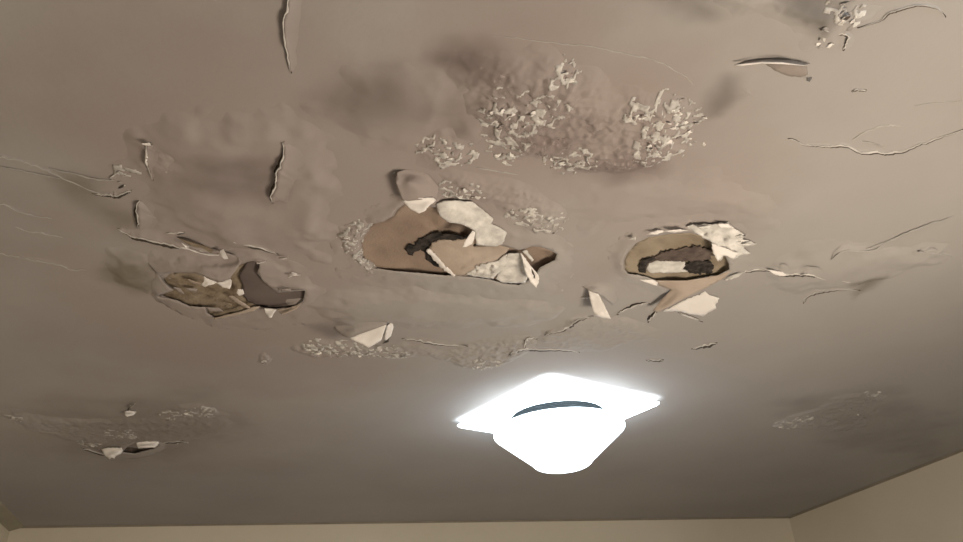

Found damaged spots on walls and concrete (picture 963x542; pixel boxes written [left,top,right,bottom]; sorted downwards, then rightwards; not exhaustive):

crack [282,0,302,73]
peeling [735,59,812,82]
crack [142,143,158,181]
crack [788,123,963,156]
crack [92,171,278,259]
flaking render [147,248,326,331]
flaking render [330,169,574,302]
flaking render [581,219,760,323]
flaking render [83,439,183,460]